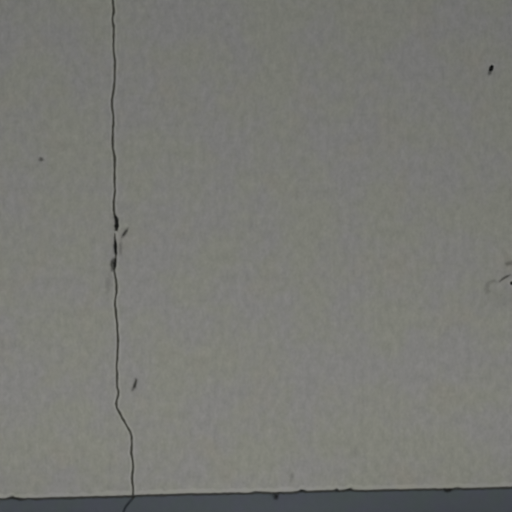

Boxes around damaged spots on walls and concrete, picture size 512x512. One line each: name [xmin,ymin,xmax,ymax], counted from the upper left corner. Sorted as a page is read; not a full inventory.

crack [109,0,137,512]